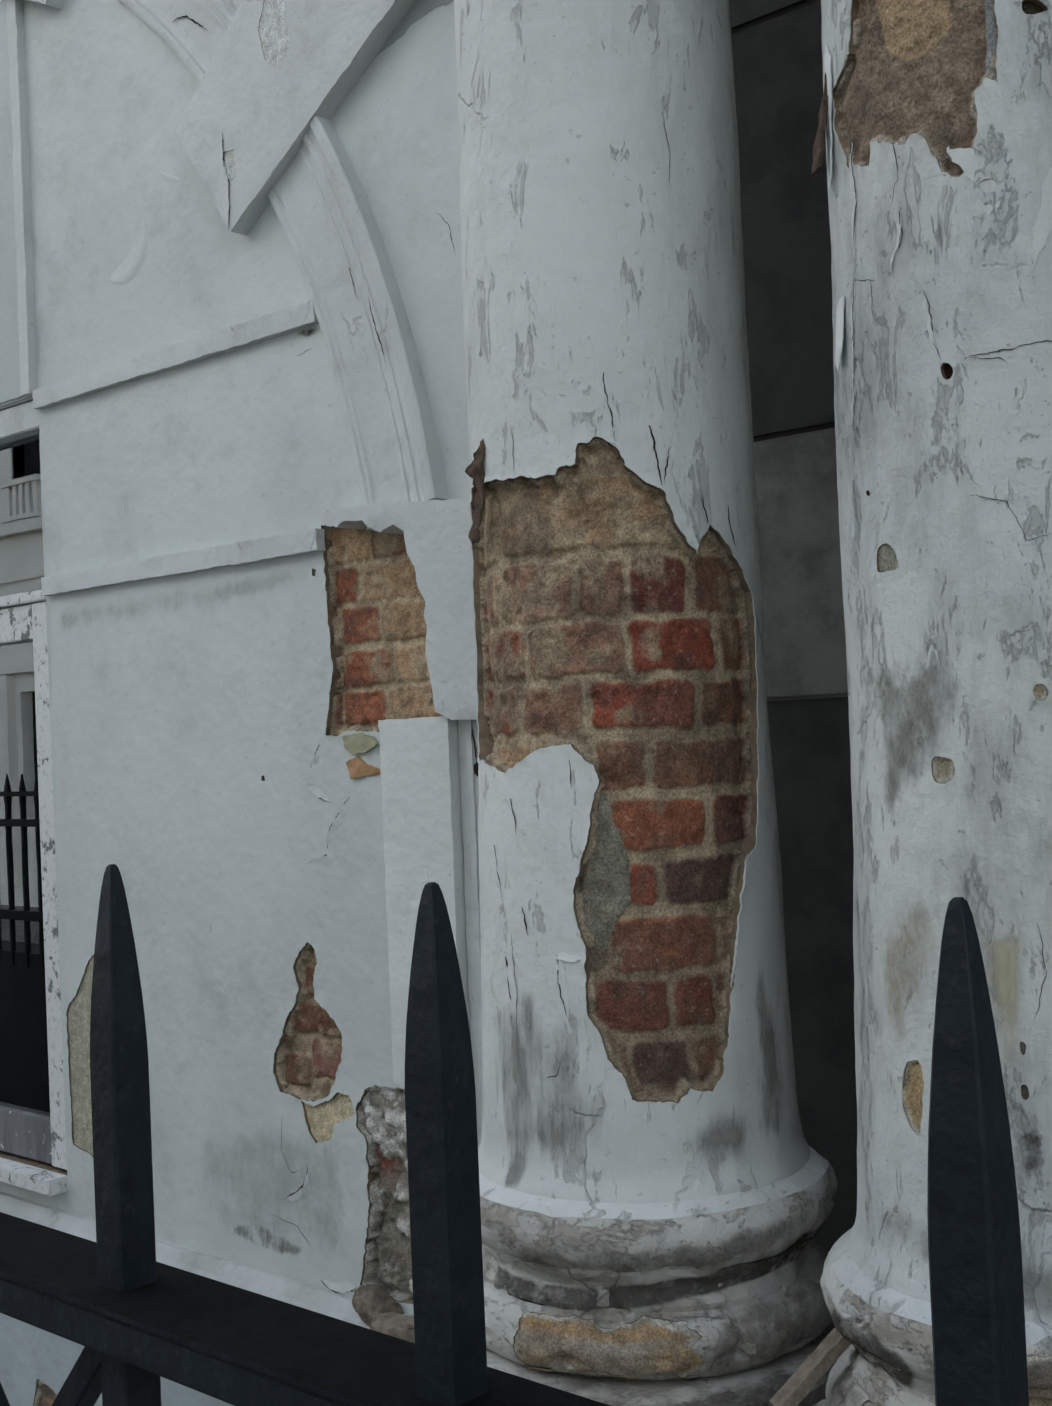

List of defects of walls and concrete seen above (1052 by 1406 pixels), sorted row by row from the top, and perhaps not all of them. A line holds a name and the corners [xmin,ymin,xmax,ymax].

crack [219,132,230,230]
peeling [812,0,1000,221]
flaking render [313,526,443,779]
flaking render [465,438,752,1102]
peeling [68,956,94,1155]
flaking render [276,943,413,1301]
peeling [902,1060,924,1136]
flaking render [34,1379,57,1406]
peeling [514,1311,704,1379]
peeling [1027,1347,1052,1406]